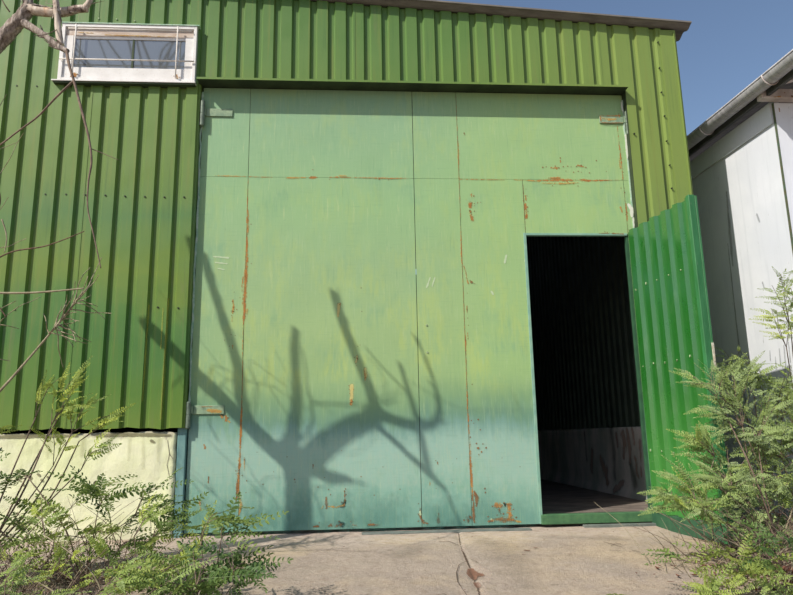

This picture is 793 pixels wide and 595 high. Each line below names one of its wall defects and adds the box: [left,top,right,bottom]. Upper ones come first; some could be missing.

rust [526,157,608,186]
rust [231,197,252,324]
rust [236,401,247,514]
crack [438,533,480,595]
rust [463,371,487,523]
rust [487,502,521,523]